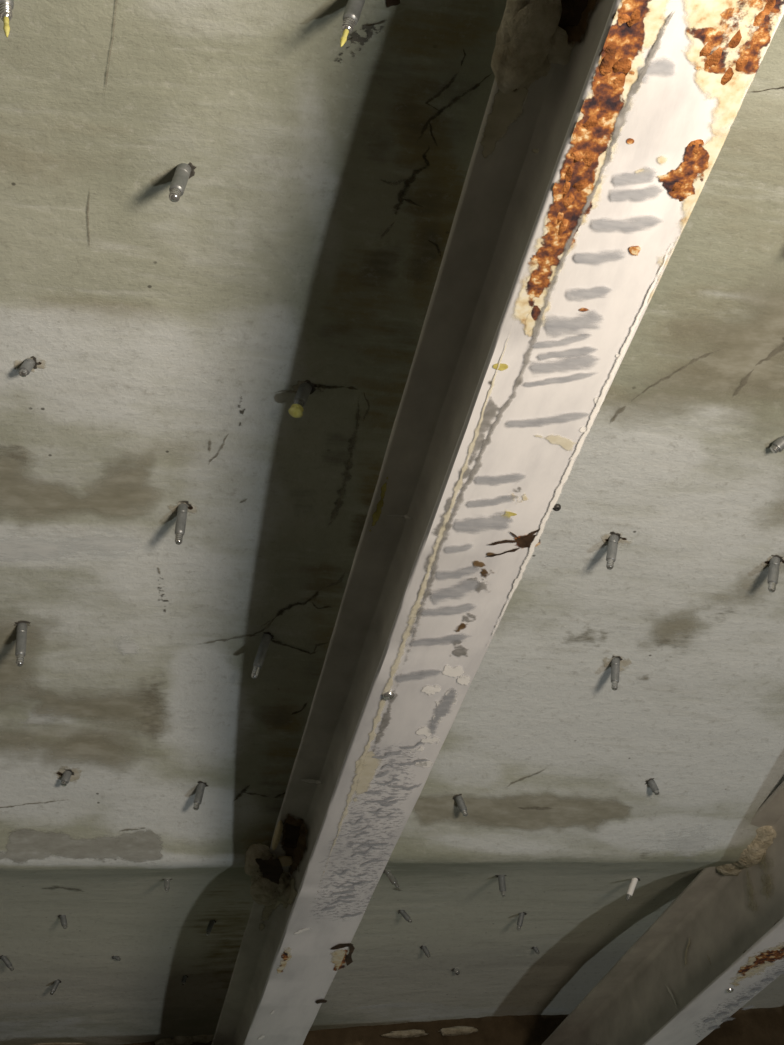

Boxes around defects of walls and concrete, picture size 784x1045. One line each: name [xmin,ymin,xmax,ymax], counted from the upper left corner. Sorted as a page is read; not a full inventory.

crack [381,49,491,238]
corrosion [514,0,668,336]
corrosion [649,0,784,302]
damp [0,453,157,517]
crack [278,385,370,520]
corrosion [468,529,540,592]
crack [206,575,344,655]
damp [0,624,164,766]
peeling [0,828,163,863]
spalling [255,856,283,884]
damp [414,795,629,830]
corrosion [731,945,784,986]